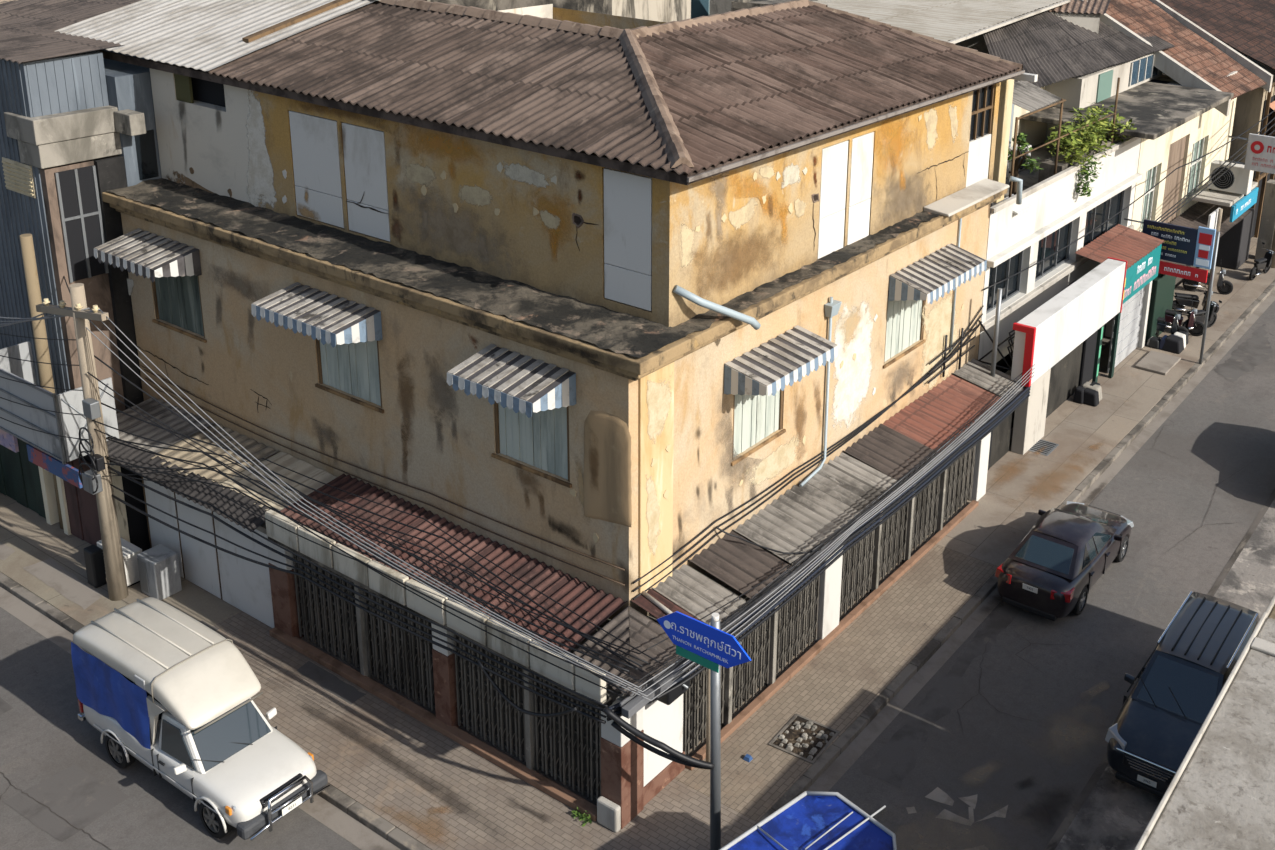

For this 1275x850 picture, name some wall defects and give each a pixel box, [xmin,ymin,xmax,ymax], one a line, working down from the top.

peeling [753,166,781,181]
crack [347,191,388,214]
peeling [452,185,500,216]
peeling [533,207,598,251]
peeling [721,194,767,230]
peeling [840,310,878,369]
peeling [647,381,671,467]